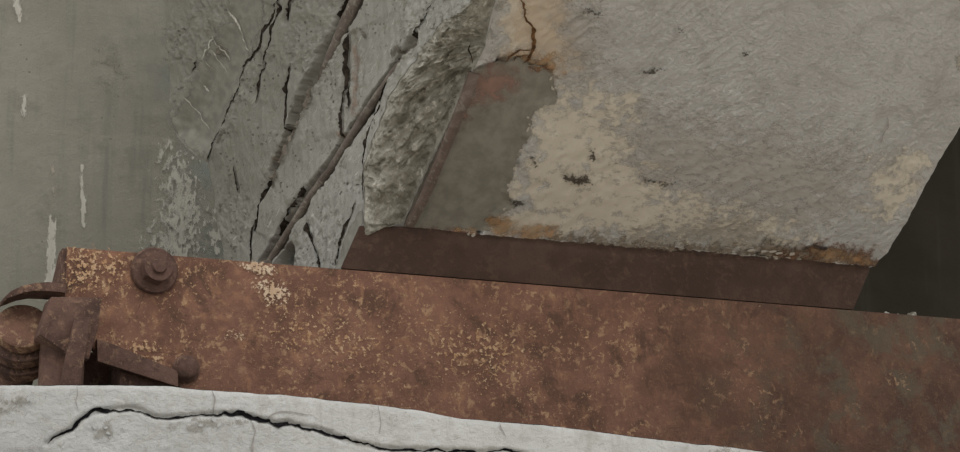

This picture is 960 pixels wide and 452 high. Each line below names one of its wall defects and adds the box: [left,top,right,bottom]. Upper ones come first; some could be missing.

crack [506,0,536,63]
crack [164,0,471,269]
spalling [225,0,558,398]
spalling [563,172,593,186]
corrosion [487,217,877,267]
peeling [588,205,802,260]
crack [49,384,516,452]